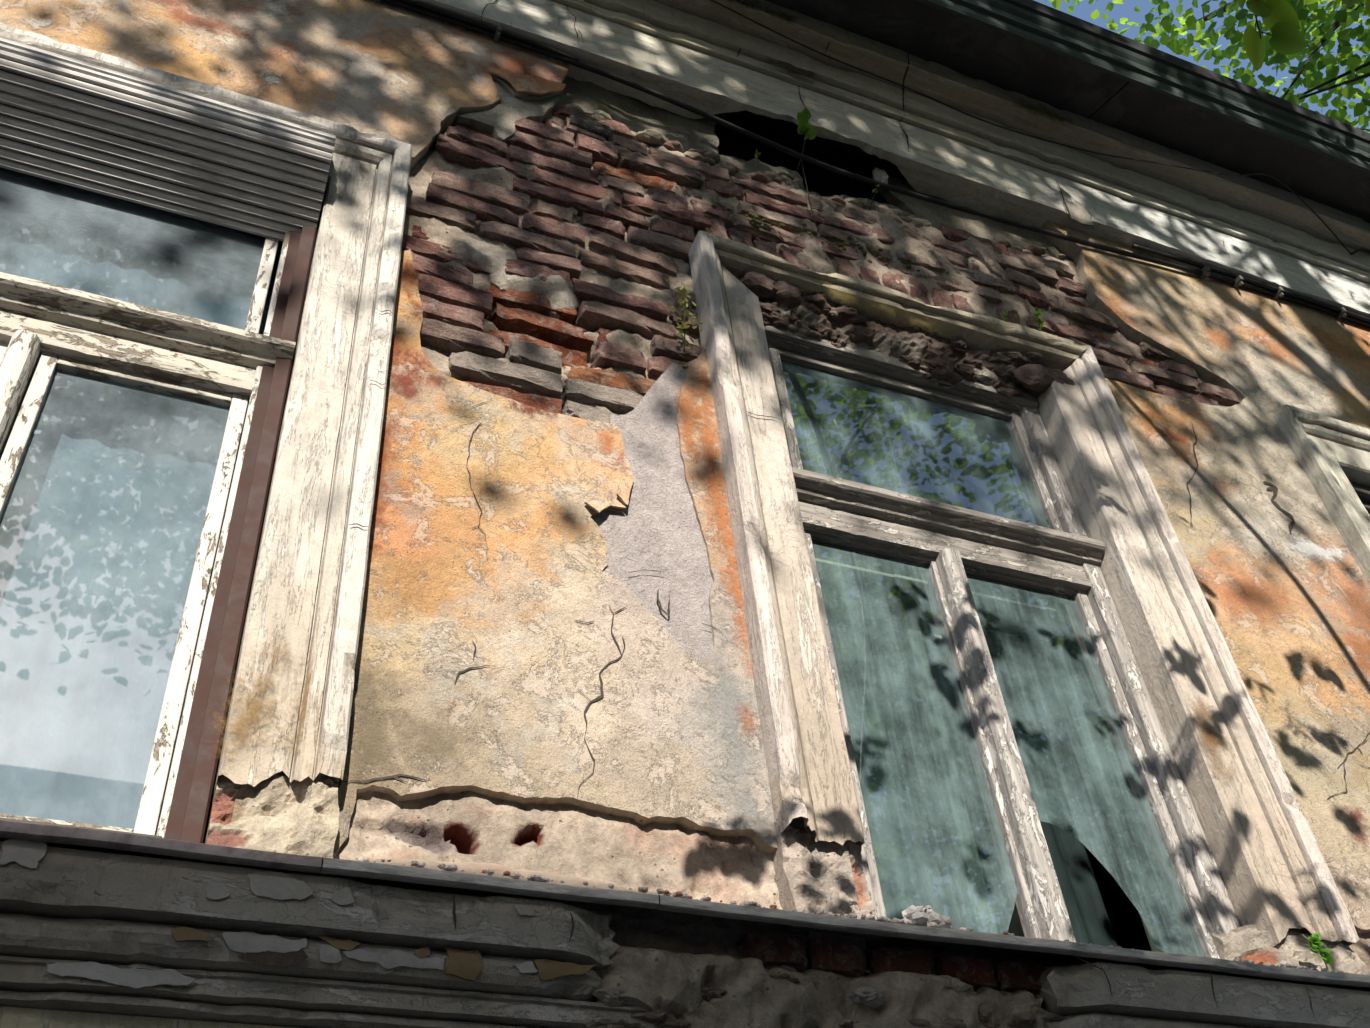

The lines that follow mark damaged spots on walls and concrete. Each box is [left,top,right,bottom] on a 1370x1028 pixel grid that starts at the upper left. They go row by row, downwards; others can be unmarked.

flaking render [401,65,1242,663]
crack [1177,422,1198,529]
crack [575,570,670,797]
crack [1328,732,1370,799]
peeling [0,839,47,869]
flaking render [202,771,886,950]
peeling [46,961,195,989]
peeling [171,926,483,981]
peeling [513,959,597,981]
flaking render [1211,924,1370,992]